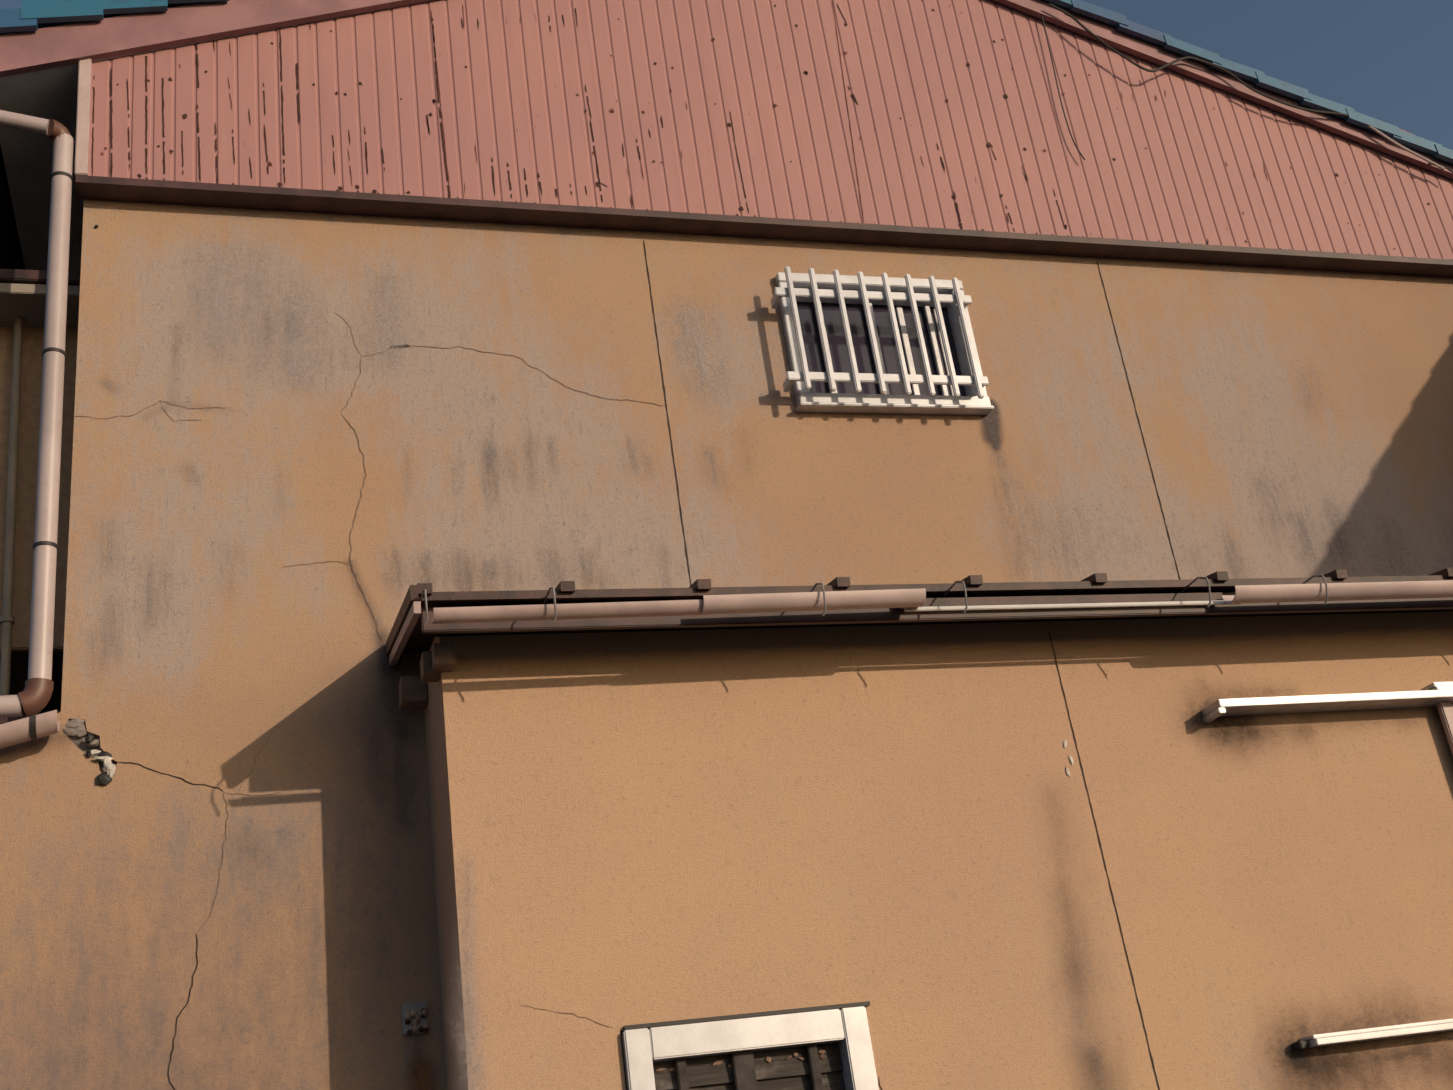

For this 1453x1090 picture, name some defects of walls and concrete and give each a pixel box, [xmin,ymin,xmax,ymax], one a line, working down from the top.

crack [78,401,227,422]
crack [284,313,663,639]
leakage [982,400,1001,449]
crack [115,735,278,1090]